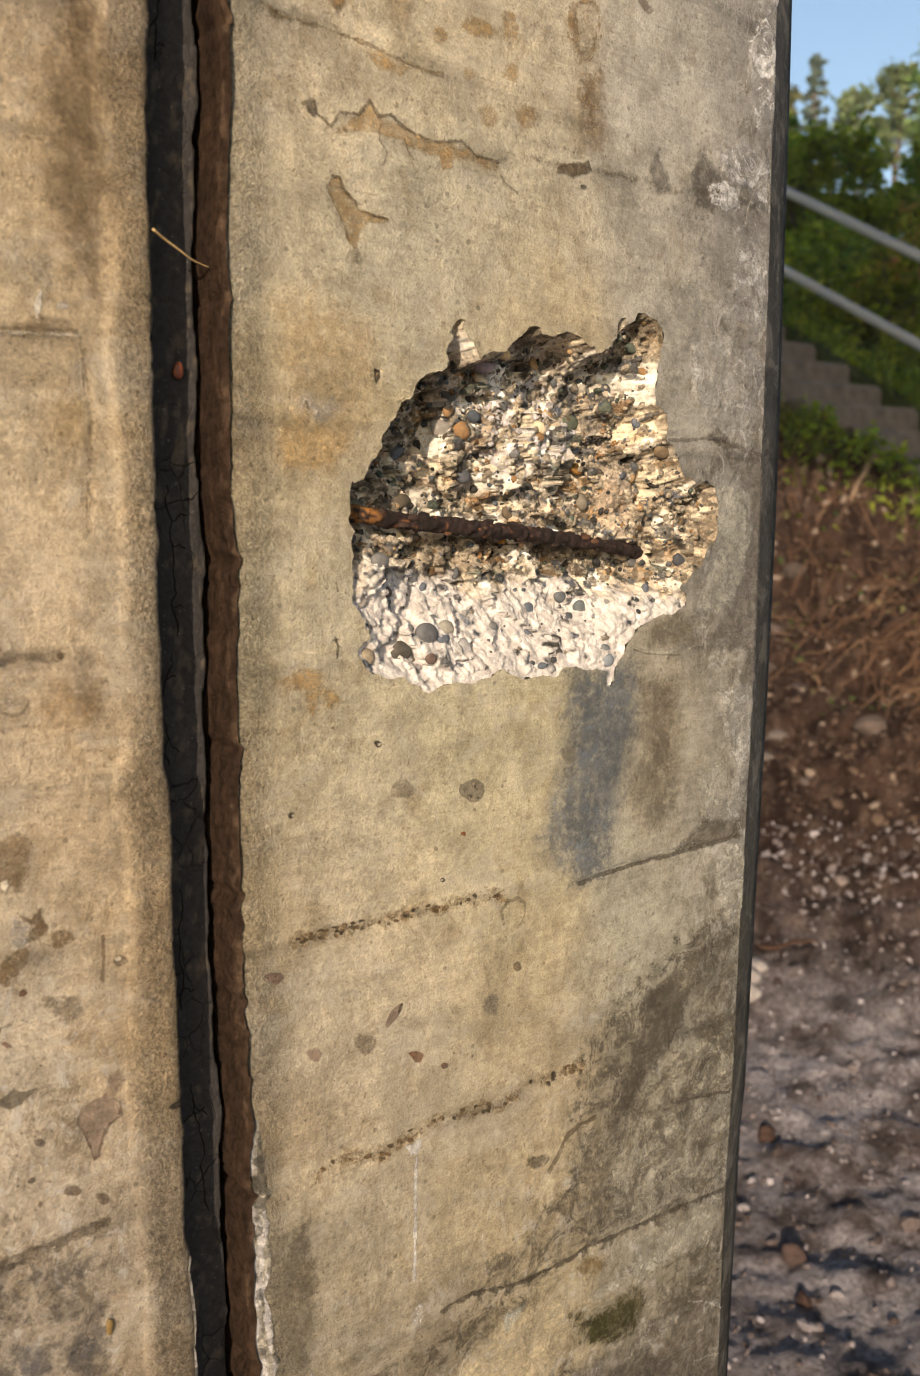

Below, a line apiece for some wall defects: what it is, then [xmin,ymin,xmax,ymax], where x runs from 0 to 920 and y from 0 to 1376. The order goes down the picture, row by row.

peeling [301,98,514,169]
peeling [558,160,591,189]
peeling [692,155,722,212]
corrosion [348,504,646,559]
spalling [350,313,719,693]
damp [652,455,763,826]
damp [459,779,484,802]
damp [542,666,681,879]
crack [527,1115,595,1174]
damp [411,843,745,1376]
damp [405,1139,421,1282]
crack [440,1188,724,1313]